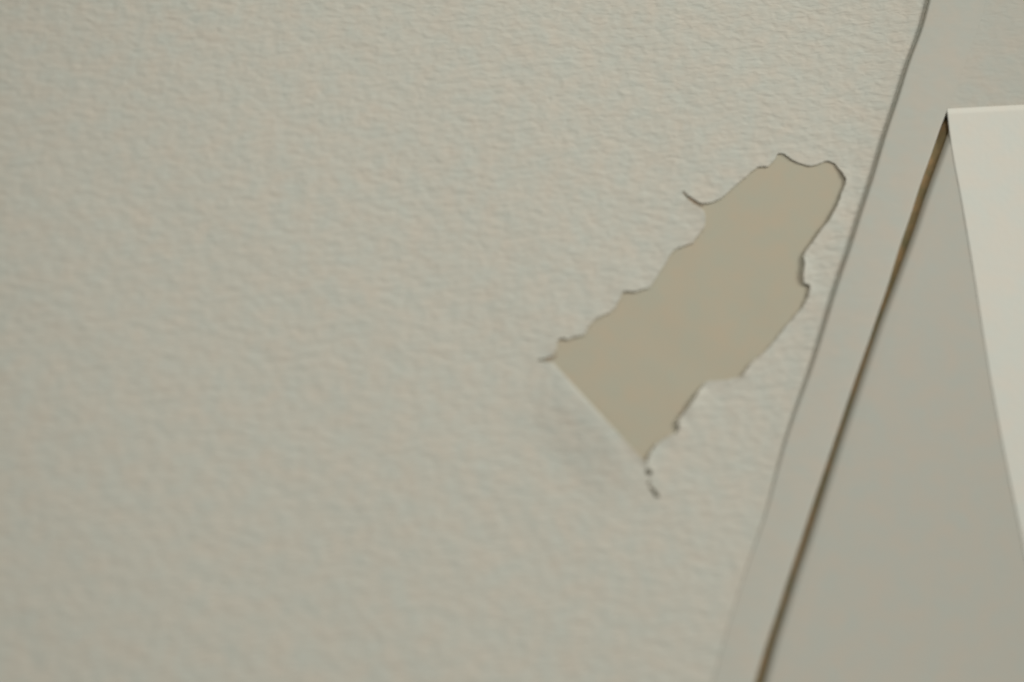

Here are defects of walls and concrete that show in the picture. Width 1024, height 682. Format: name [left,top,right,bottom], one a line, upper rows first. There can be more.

peeling [507,133,862,522]